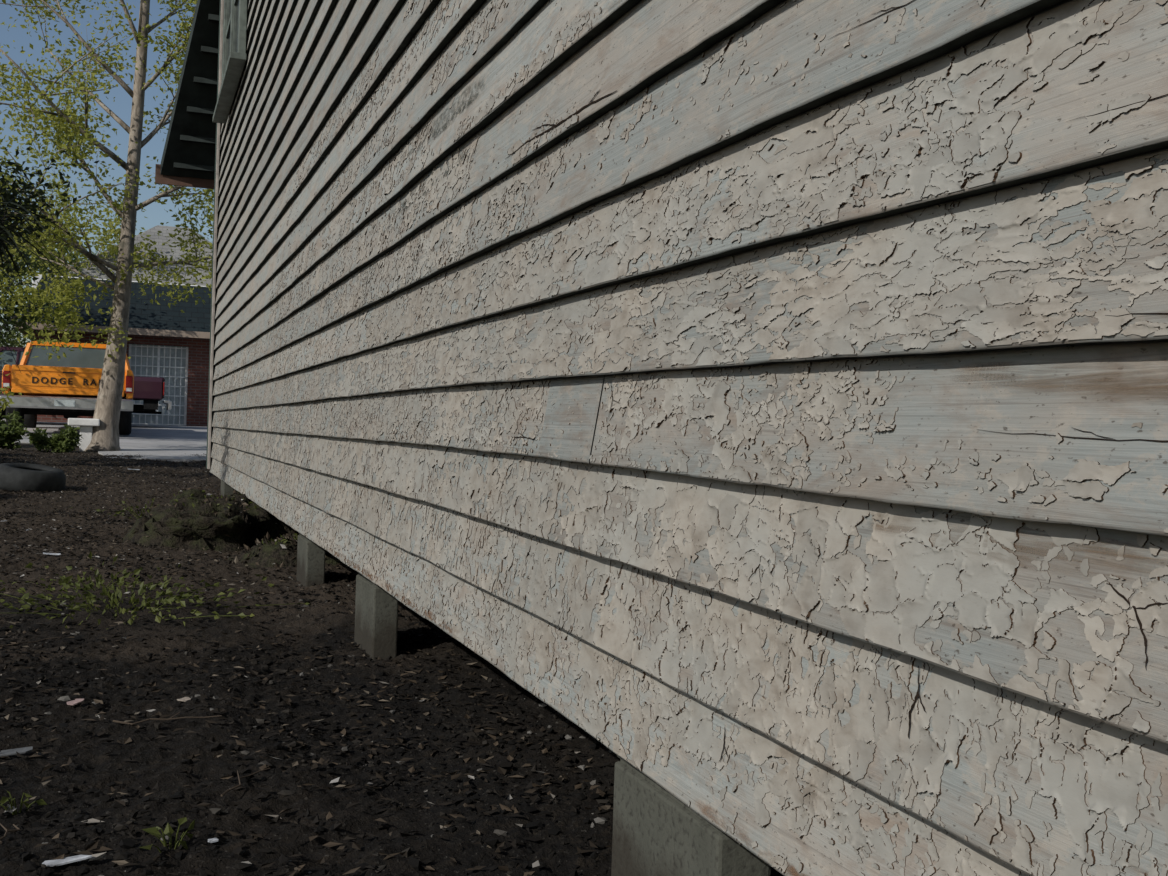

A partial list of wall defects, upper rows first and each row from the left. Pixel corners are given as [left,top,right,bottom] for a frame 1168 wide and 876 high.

peeling [285,0,462,194]
peeling [425,0,526,98]
peeling [453,2,602,142]
peeling [700,21,788,111]
peeling [1078,61,1105,84]
peeling [1084,93,1151,133]
peeling [268,115,481,328]
peeling [313,98,616,329]
peeling [747,366,778,389]
peeling [968,452,1136,505]
peeling [1116,528,1168,561]
peeling [770,848,804,873]